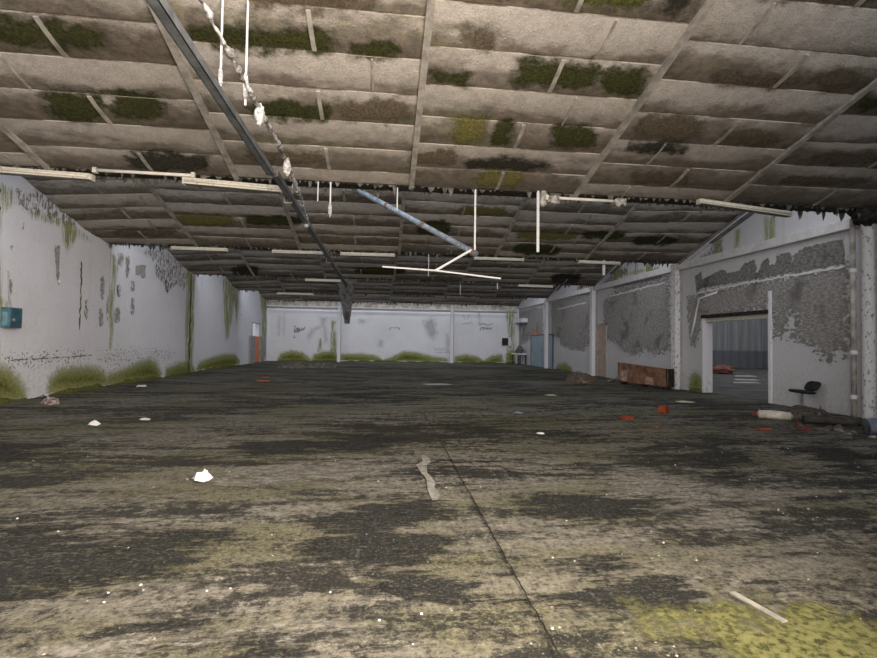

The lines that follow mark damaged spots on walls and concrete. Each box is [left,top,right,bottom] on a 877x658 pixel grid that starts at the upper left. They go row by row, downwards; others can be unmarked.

damp [0,13,105,52]
damp [462,23,495,52]
damp [429,68,471,87]
damp [601,65,649,97]
damp [106,88,168,119]
damp [551,124,599,149]
damp [626,113,706,156]
damp [408,148,549,172]
peeling [520,289,590,351]
peeling [602,268,671,360]
peeling [686,237,859,366]
crack [415,415,563,658]